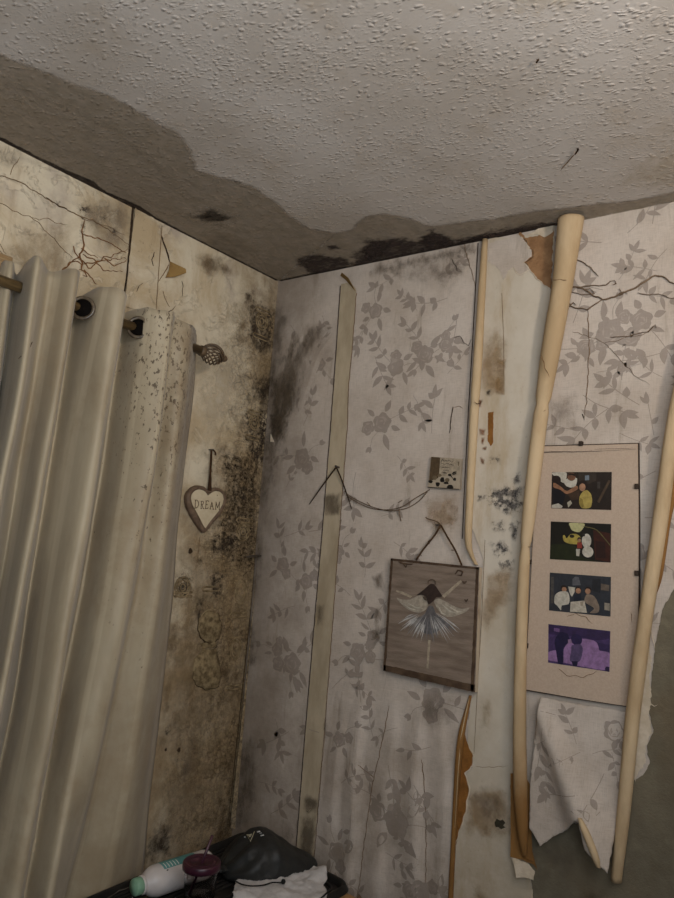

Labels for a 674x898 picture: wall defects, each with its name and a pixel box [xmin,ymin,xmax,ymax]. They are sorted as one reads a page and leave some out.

crack [0,157,129,256]
water stain [0,55,674,281]
peeling [124,207,186,309]
water stain [246,294,276,351]
water stain [212,332,313,566]
water stain [479,475,523,539]
peeling [453,226,674,898]